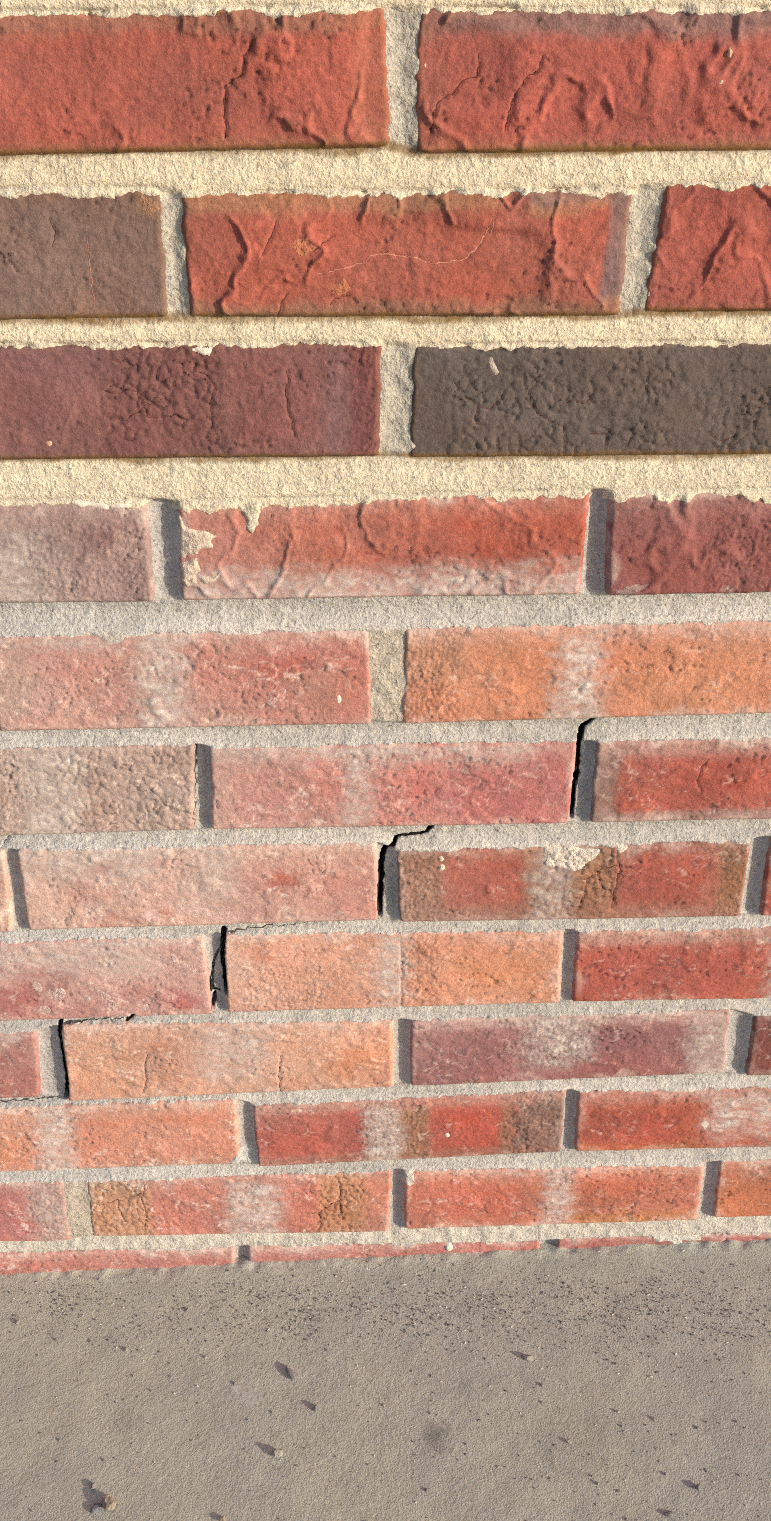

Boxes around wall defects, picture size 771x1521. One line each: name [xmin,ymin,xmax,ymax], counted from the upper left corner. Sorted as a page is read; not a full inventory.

crack [191,744,199,820]
crack [570,717,598,815]
crack [378,825,433,1006]
crack [565,861,621,908]
crack [211,921,324,1009]
crack [0,1014,133,1103]